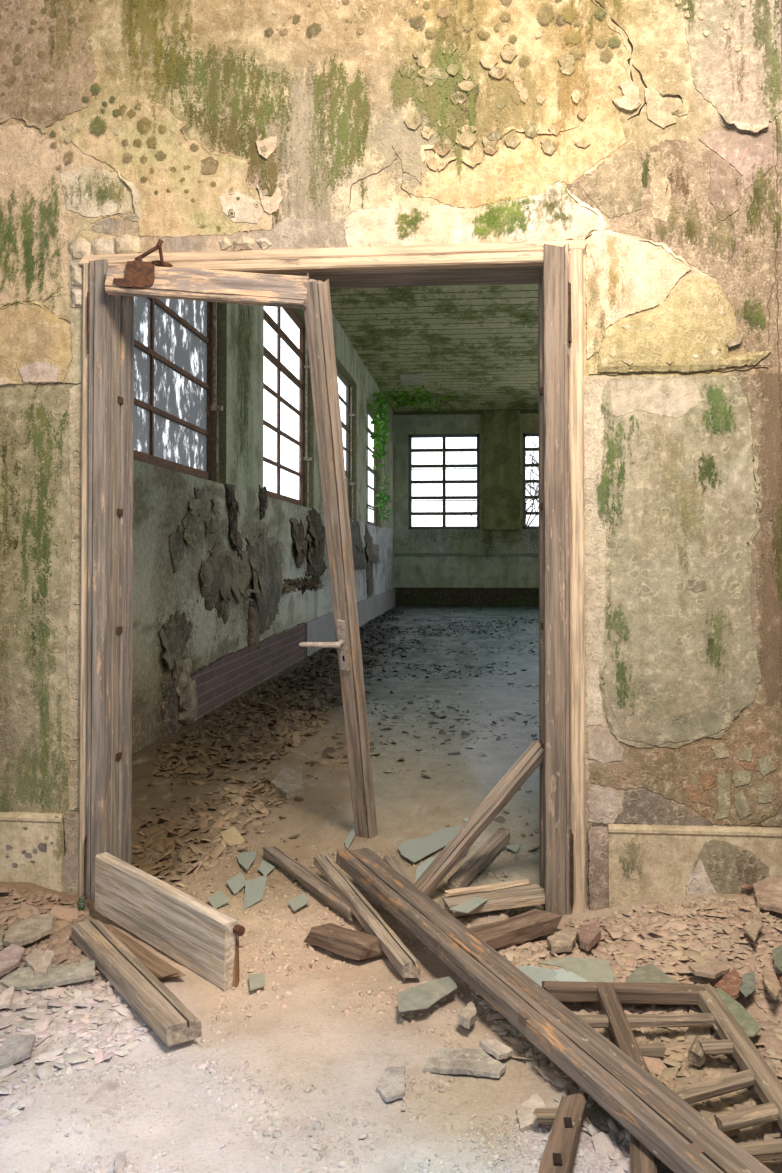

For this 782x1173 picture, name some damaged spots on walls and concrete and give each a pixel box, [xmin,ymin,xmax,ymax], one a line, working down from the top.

crack [592,0,647,119]
water stain [262,64,344,223]
water stain [3,230,44,313]
flaking render [0,0,782,818]
water stain [606,441,625,525]
water stain [699,463,716,485]
water stain [701,404,731,437]
water stain [0,454,50,672]
water stain [616,651,635,721]
peeling [584,375,782,911]
water stain [31,684,62,809]
peeling [6,836,54,868]